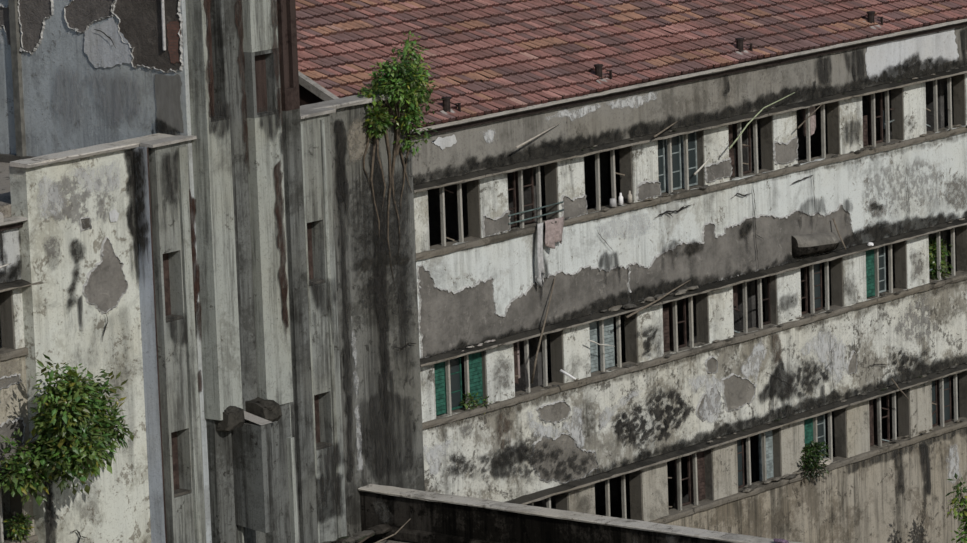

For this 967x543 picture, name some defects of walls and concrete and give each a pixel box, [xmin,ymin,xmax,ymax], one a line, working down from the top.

flaking render [0,0,184,133]
flaking render [82,237,128,314]
damp [125,148,149,282]
damp [310,120,416,522]
peeling [432,134,457,150]
flaking render [417,203,854,358]
damp [413,29,967,185]
damp [428,210,967,358]
flaking render [945,177,967,211]
flaking render [0,373,22,404]
flaking render [0,417,27,467]
damp [450,334,967,481]